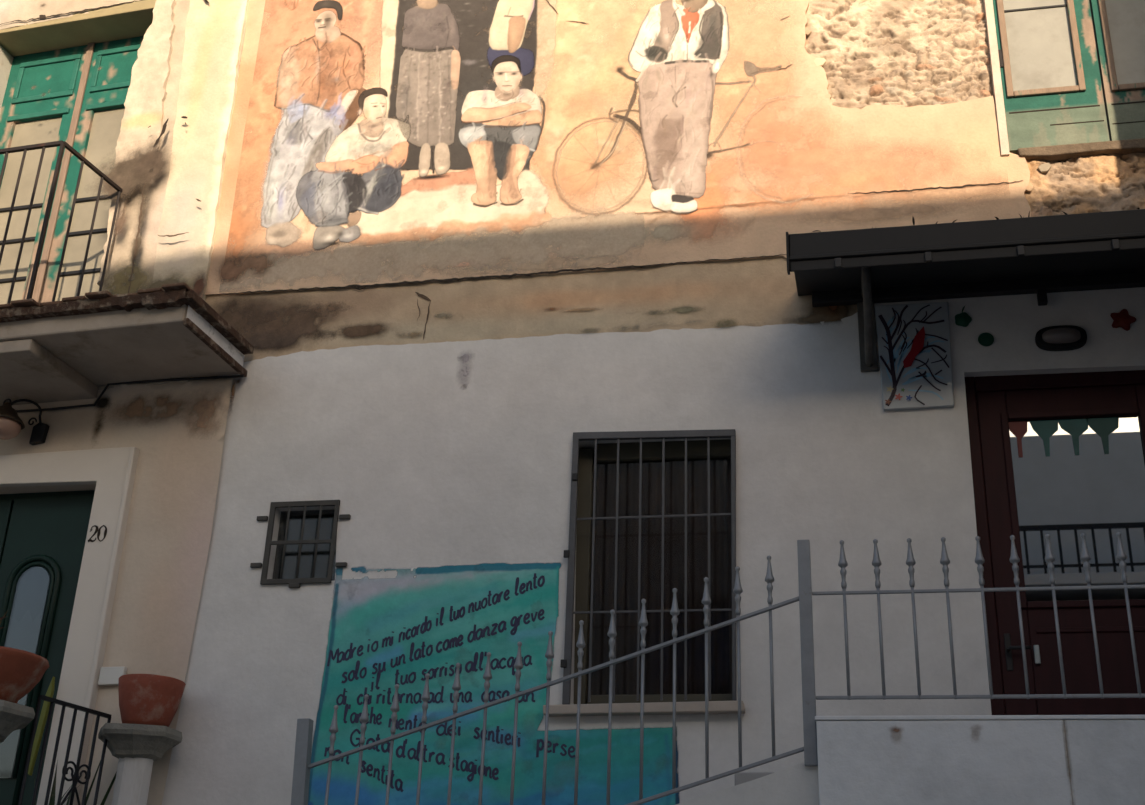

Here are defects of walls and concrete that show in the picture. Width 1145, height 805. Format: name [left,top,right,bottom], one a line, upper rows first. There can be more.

spalling [804,0,994,109]
spalling [1024,153,1145,217]
water stain [101,141,206,296]
water stain [220,255,269,281]
water stain [219,298,385,350]
water stain [94,397,109,434]
water stain [120,396,218,430]